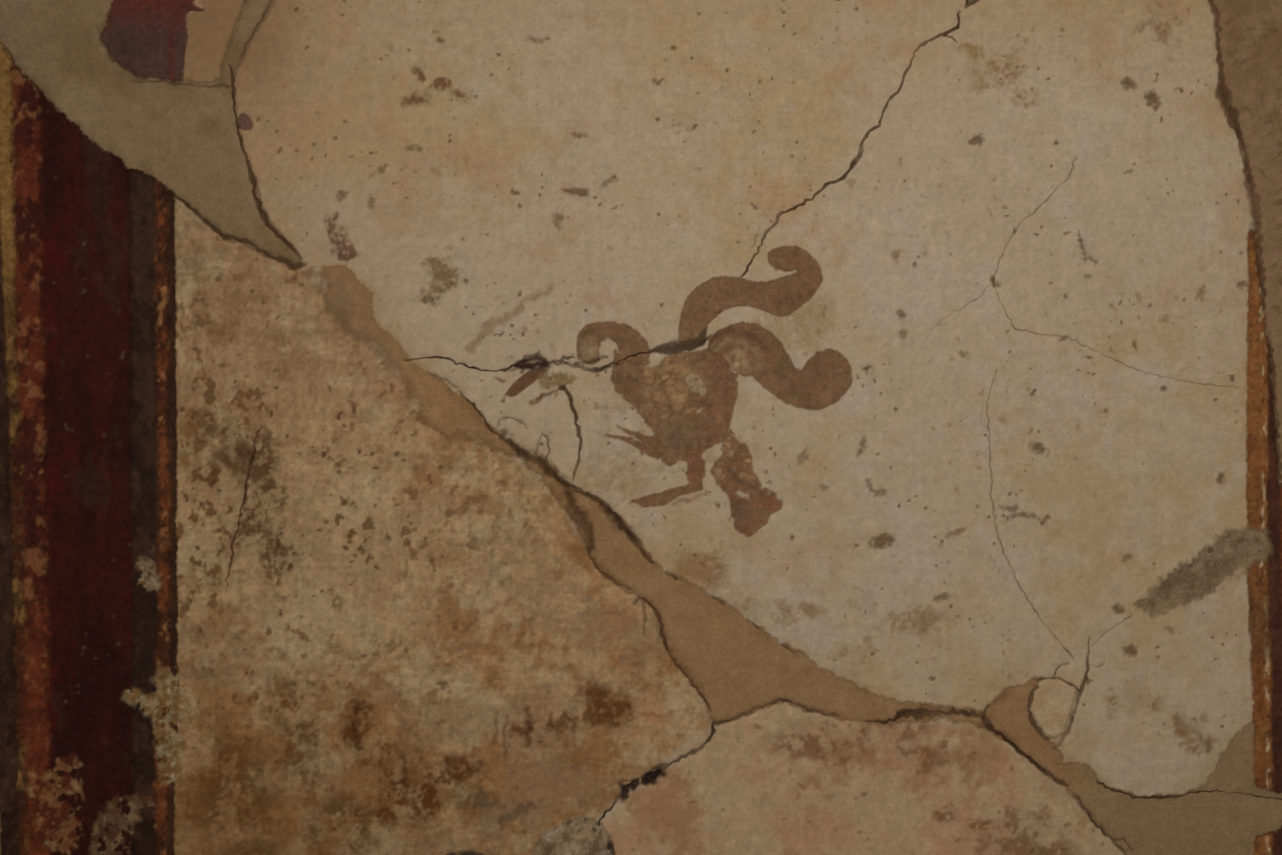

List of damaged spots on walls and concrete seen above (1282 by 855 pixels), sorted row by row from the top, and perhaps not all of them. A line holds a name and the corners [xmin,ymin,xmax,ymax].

spalling [236,114,253,129]
crack [742,13,960,276]
spalling [649,329,706,354]
crack [689,337,708,351]
spalling [518,357,550,373]
crack [419,352,651,536]
spalling [875,535,893,547]
spalling [1113,528,1273,616]
crack [1073,668,1089,693]
peeling [1029,678,1089,739]
spalling [620,769,665,800]
crack [1098,782,1220,799]